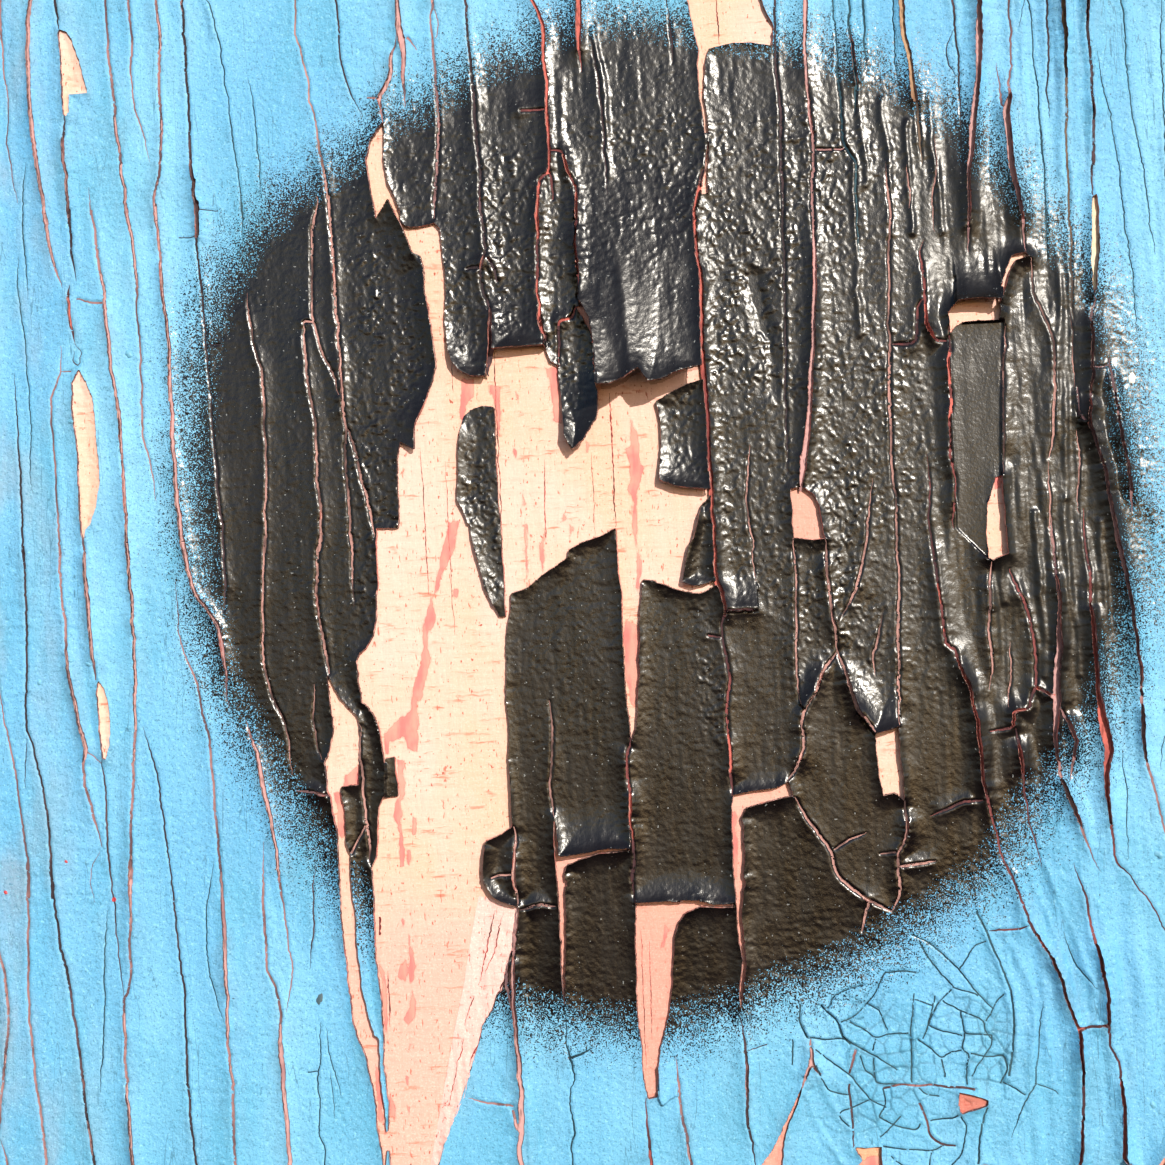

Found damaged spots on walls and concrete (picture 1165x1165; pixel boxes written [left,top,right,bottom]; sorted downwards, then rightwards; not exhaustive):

peeling [57,30,87,116]
peeling [71,371,100,537]
crack [0,0,341,1165]
crack [247,0,375,797]
crack [335,0,498,377]
crack [520,0,580,366]
peeling [324,0,794,1165]
crack [739,0,1165,1165]
peeling [948,242,1028,332]
peeling [986,477,1009,559]
crack [350,724,372,869]
peeling [762,1080,938,1165]